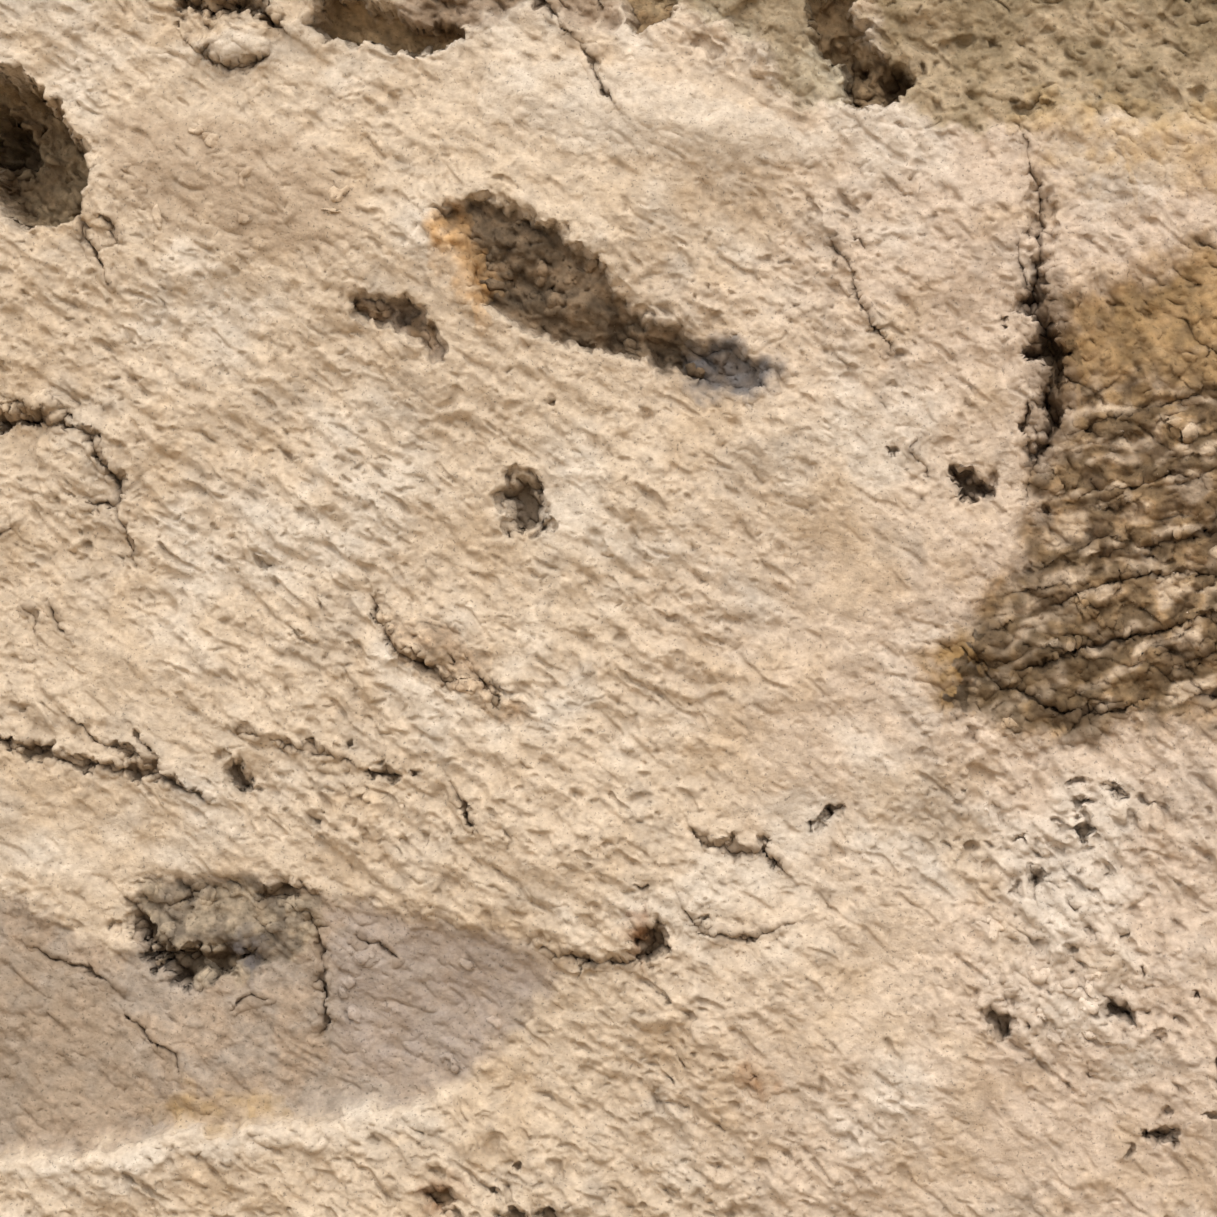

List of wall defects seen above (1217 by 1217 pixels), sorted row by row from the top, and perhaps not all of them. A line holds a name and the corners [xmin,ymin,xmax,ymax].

spalling [309,0,465,59]
spalling [808,0,917,110]
peeling [0,73,371,278]
spalling [348,285,449,371]
spalling [435,189,705,380]
crack [1003,129,1072,506]
leakage [1014,265,1084,472]
crack [0,387,142,562]
leakage [1186,501,1217,575]
crack [0,711,214,808]
crack [231,718,361,777]
leakage [938,583,1140,771]